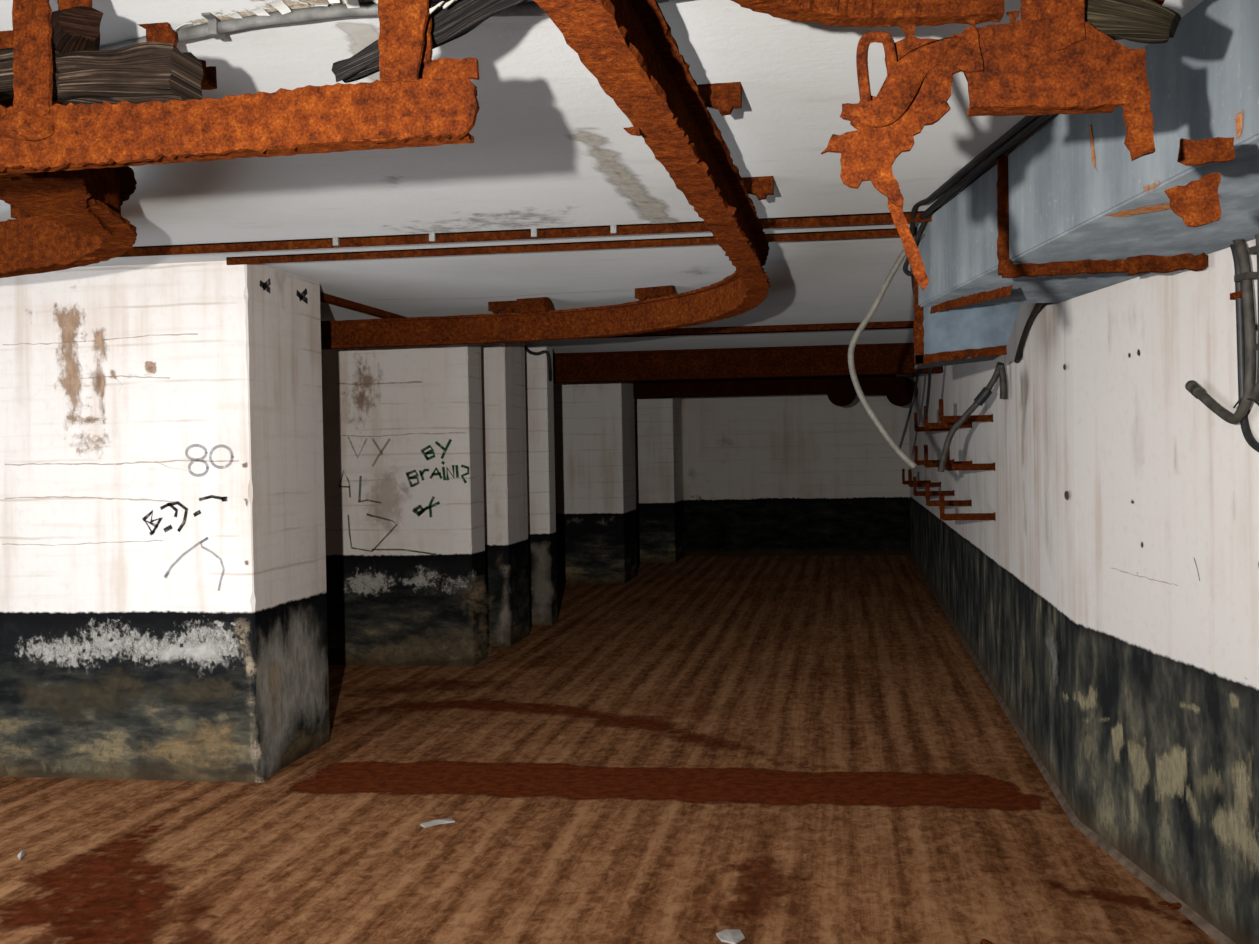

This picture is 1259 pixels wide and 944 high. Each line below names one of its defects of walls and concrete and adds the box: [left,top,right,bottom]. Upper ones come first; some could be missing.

damp [573,131,677,224]
rust [1106,203,1171,217]
damp [1047,634,1057,683]